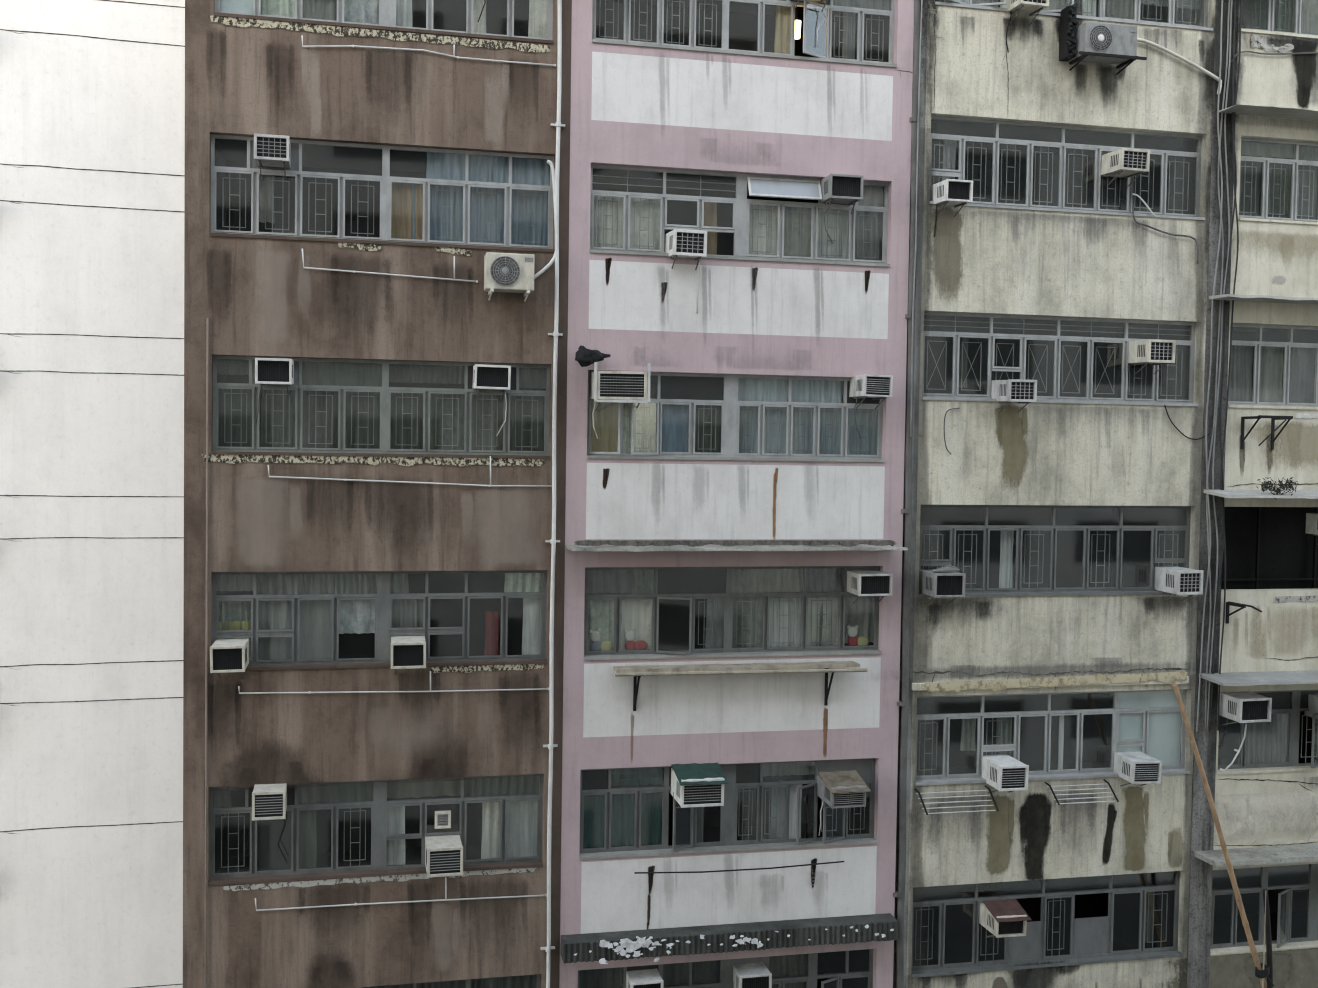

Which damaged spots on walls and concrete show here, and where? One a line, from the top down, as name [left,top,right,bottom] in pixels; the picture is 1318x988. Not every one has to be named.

water stain [1269,35,1318,108]
water stain [931,208,962,294]
water stain [995,406,1028,487]
water stain [941,793,1092,880]
water stain [1102,787,1149,871]
water stain [992,961,1080,988]